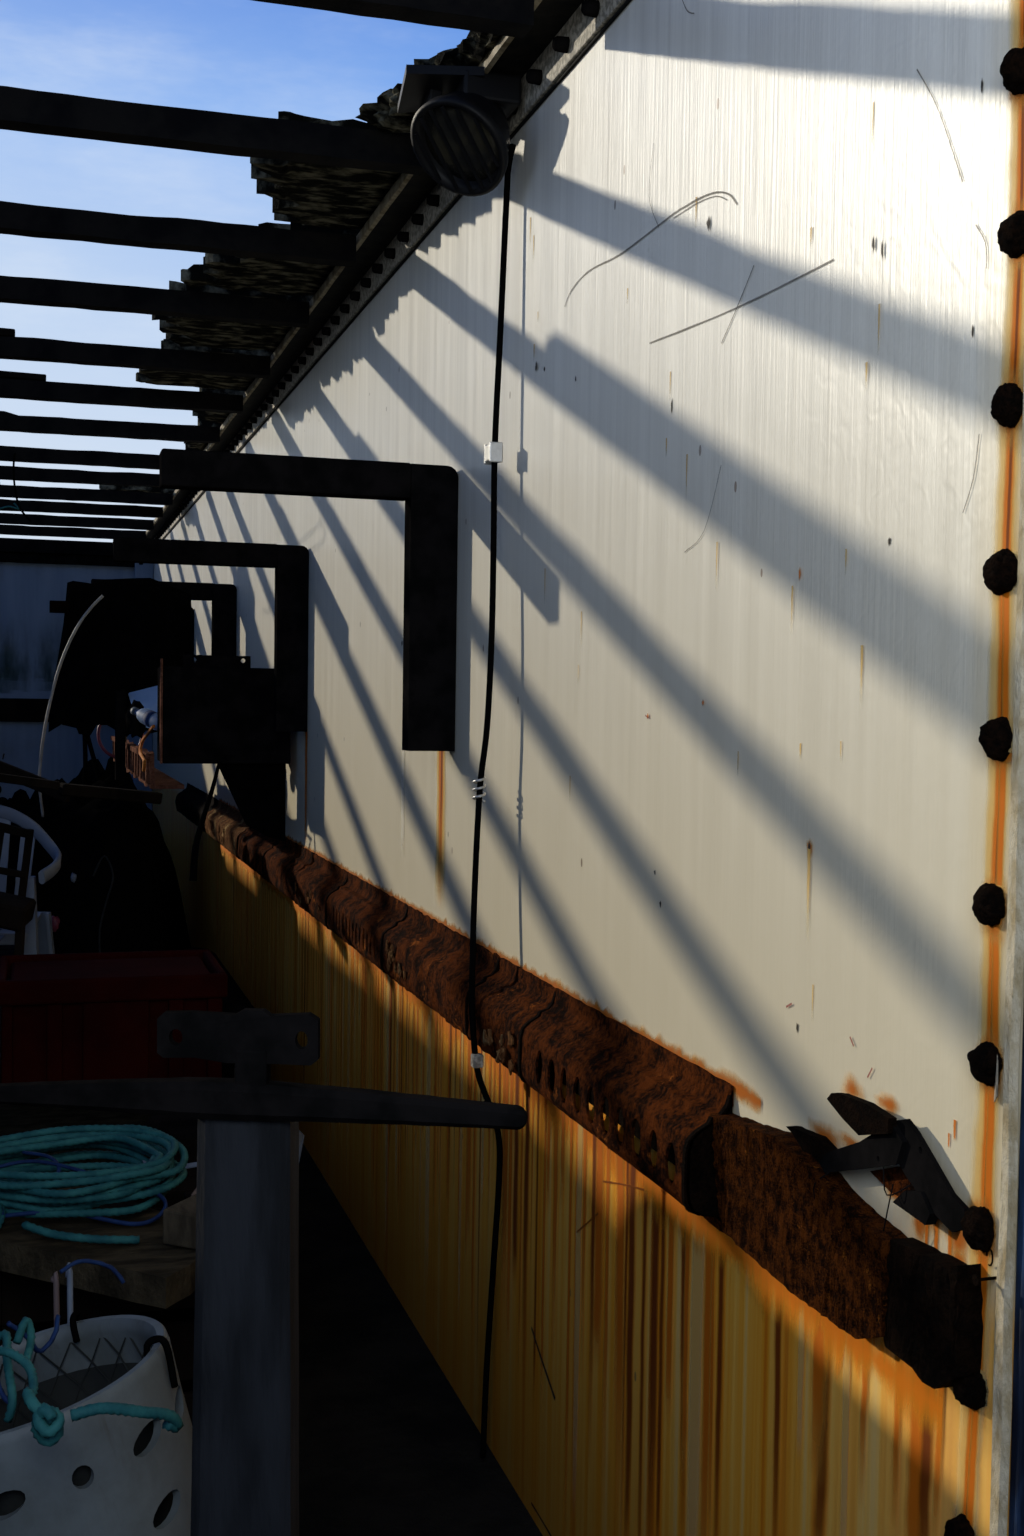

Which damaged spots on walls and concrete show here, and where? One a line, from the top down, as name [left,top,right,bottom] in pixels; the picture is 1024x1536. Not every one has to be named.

rust [285,732,761,1110]
rust [210,821,991,1536]
rust [972,1082,998,1220]
rust [981,918,1003,1050]